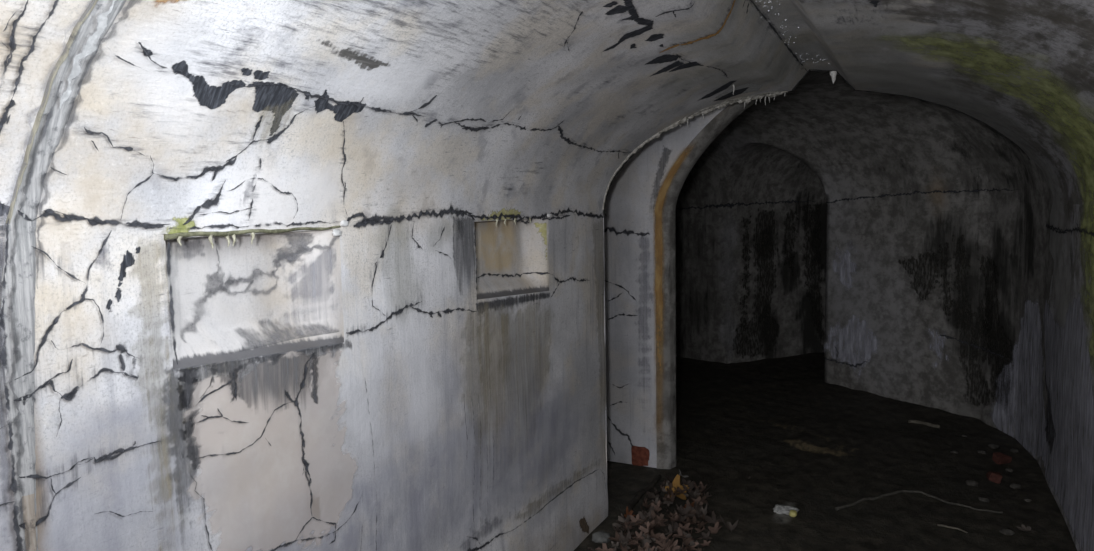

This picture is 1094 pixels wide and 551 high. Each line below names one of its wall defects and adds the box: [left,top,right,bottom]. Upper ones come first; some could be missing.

crack [0,0,58,133]
crack [109,42,188,76]
crack [15,82,650,434]
corrosion [654,149,689,373]
water stain [732,204,825,358]
water stain [899,235,1012,407]
crack [1046,223,1094,237]
crack [0,441,160,529]
crack [191,352,359,551]
crack [466,384,633,551]